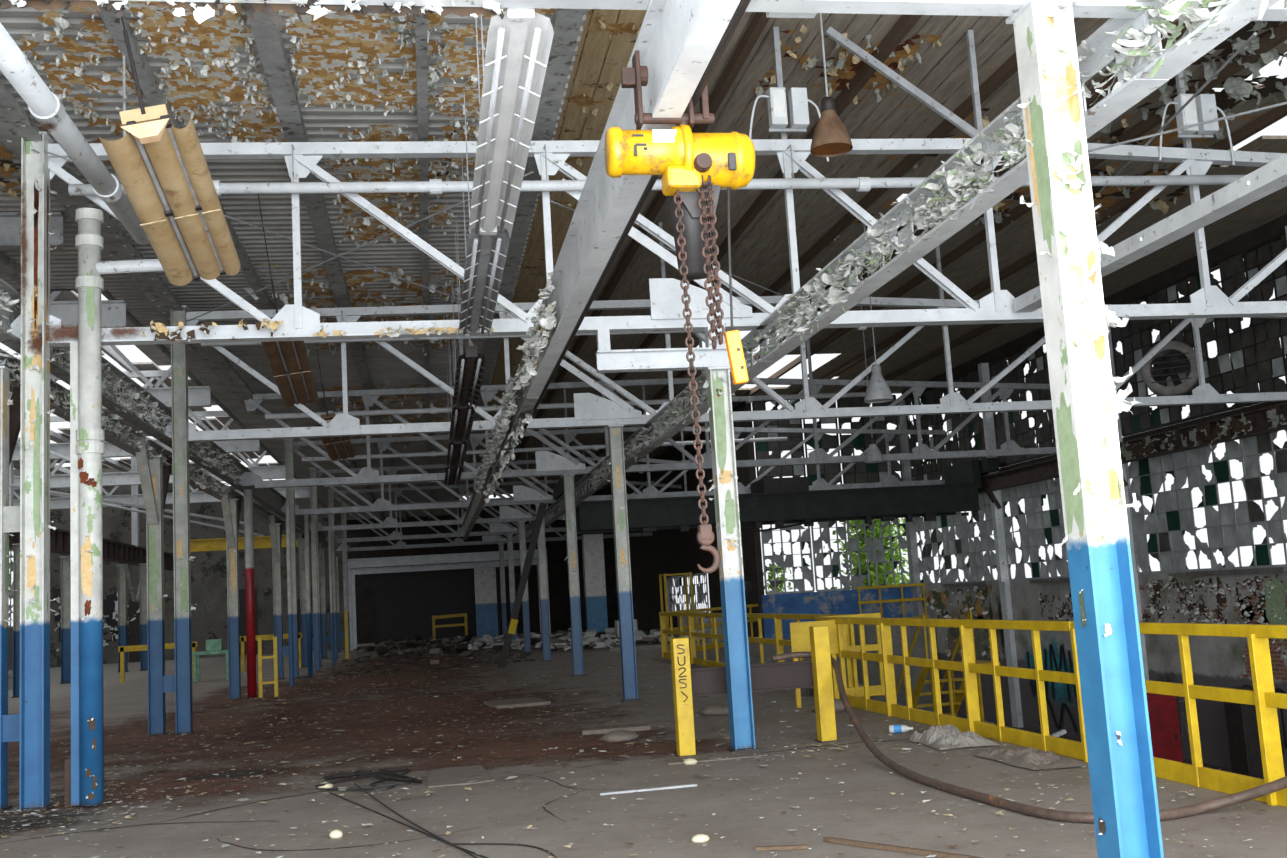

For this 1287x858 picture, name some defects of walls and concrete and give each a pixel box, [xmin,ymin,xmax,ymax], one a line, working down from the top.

peeling [535,8,555,16]
peeling [0,0,505,143]
peeling [566,82,613,116]
peeling [324,157,476,247]
peeling [585,0,1287,562]
corrosion [77,458,97,488]
peeling [1139,573,1287,682]